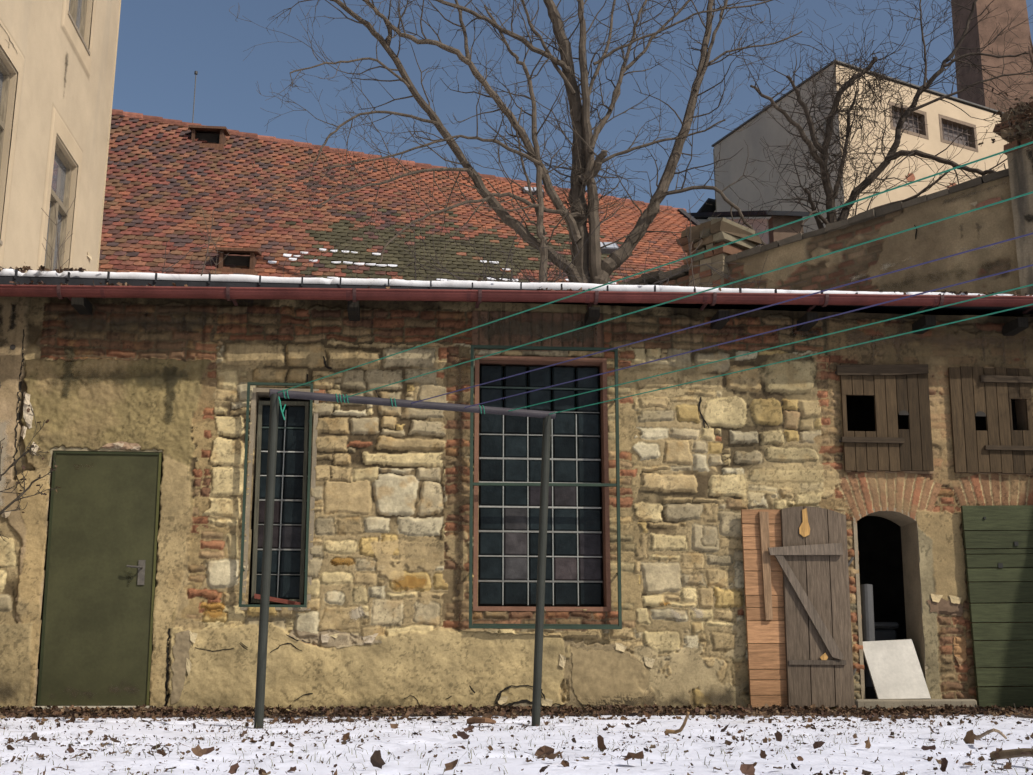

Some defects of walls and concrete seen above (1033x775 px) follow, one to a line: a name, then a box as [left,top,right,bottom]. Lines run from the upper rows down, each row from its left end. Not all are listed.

flaking render [21,392,39,455]
water stain [165,367,177,422]